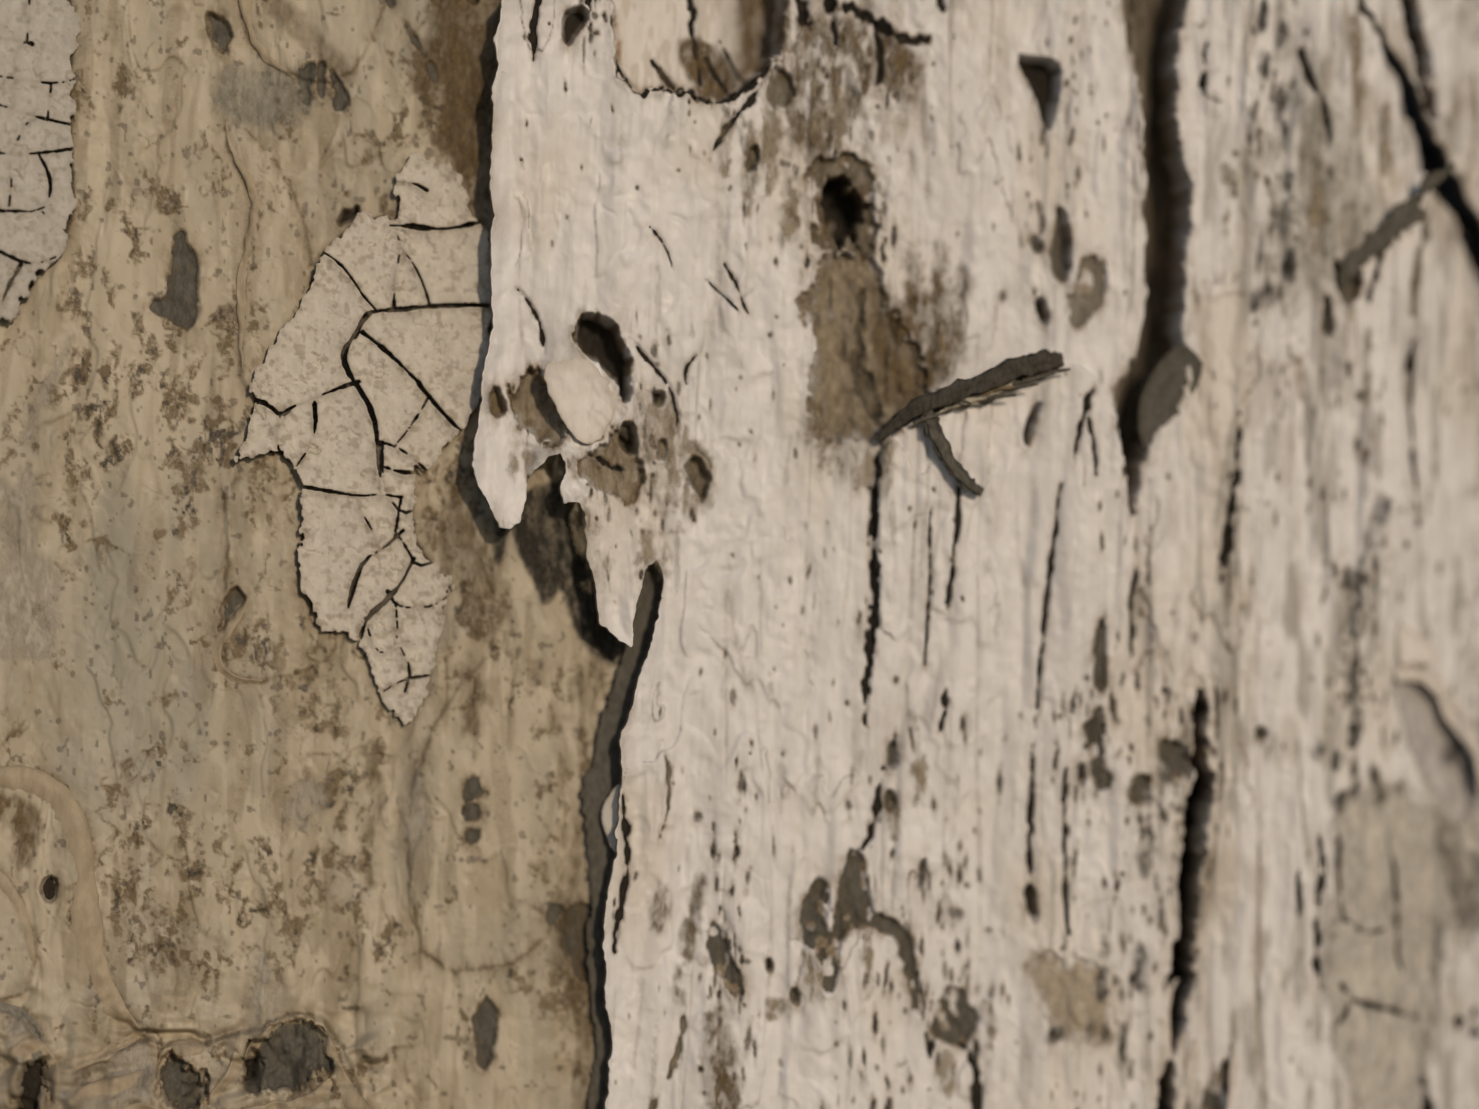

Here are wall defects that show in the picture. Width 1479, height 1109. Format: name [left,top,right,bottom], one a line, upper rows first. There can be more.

peeling [0,0,81,322]
crack [615,0,776,151]
crack [796,0,945,86]
crack [1198,43,1208,94]
peeling [150,230,198,330]
peeling [233,152,492,725]
spalling [807,178,1071,497]
crack [1367,208,1430,527]
crack [861,443,882,726]
spalling [800,850,978,1045]
crack [1296,834,1415,1026]
spalling [198,1013,373,1109]